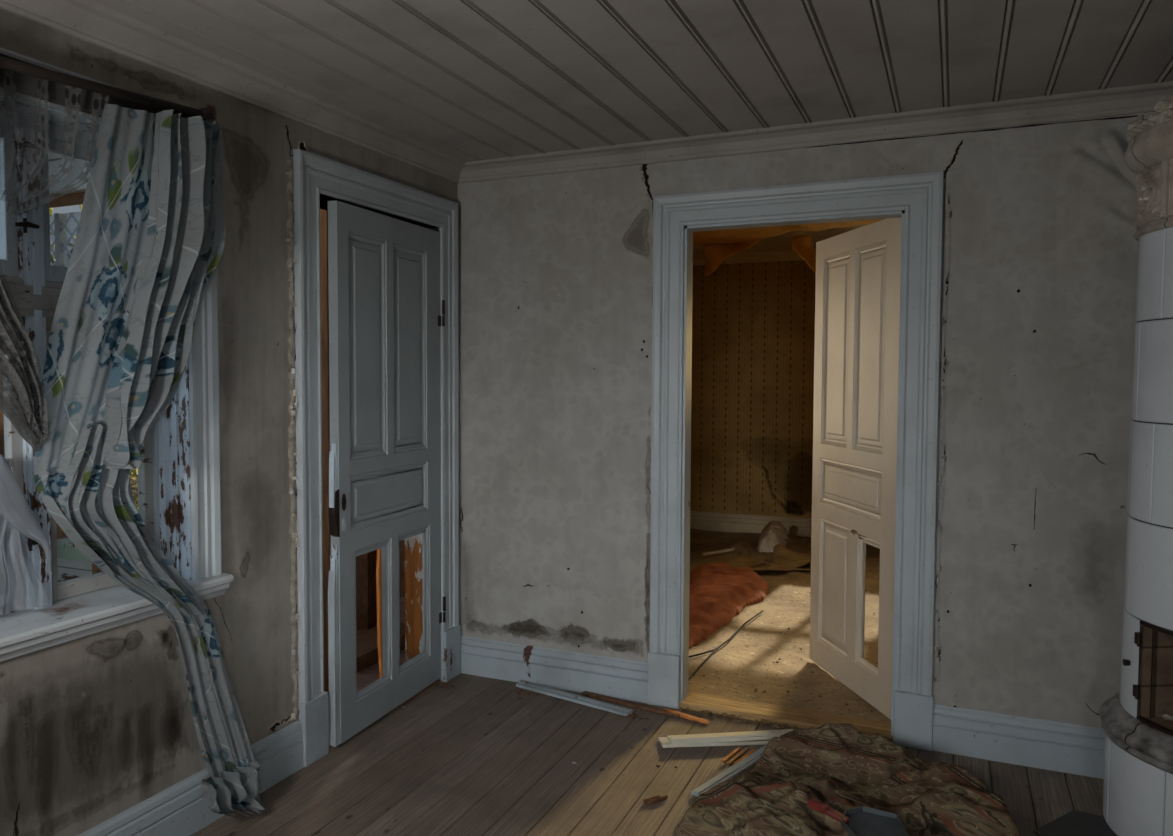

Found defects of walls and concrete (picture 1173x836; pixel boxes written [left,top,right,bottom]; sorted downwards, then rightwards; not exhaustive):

crack [806,115,1138,178]
crack [639,164,653,209]